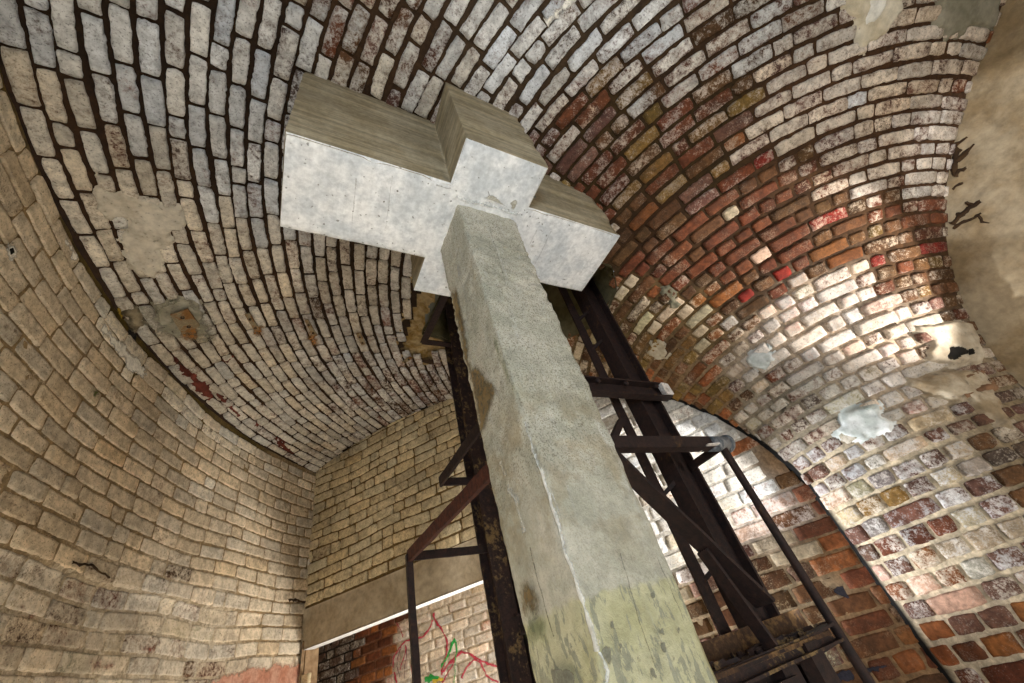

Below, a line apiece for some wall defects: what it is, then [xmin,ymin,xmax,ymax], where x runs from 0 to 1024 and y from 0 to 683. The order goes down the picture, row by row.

flaking render [866,0,887,24]
crack [948,136,990,230]
water stain [746,343,776,372]
spalling [948,346,975,360]
peeling [173,356,240,417]
peeling [964,370,999,398]
crack [72,561,110,579]